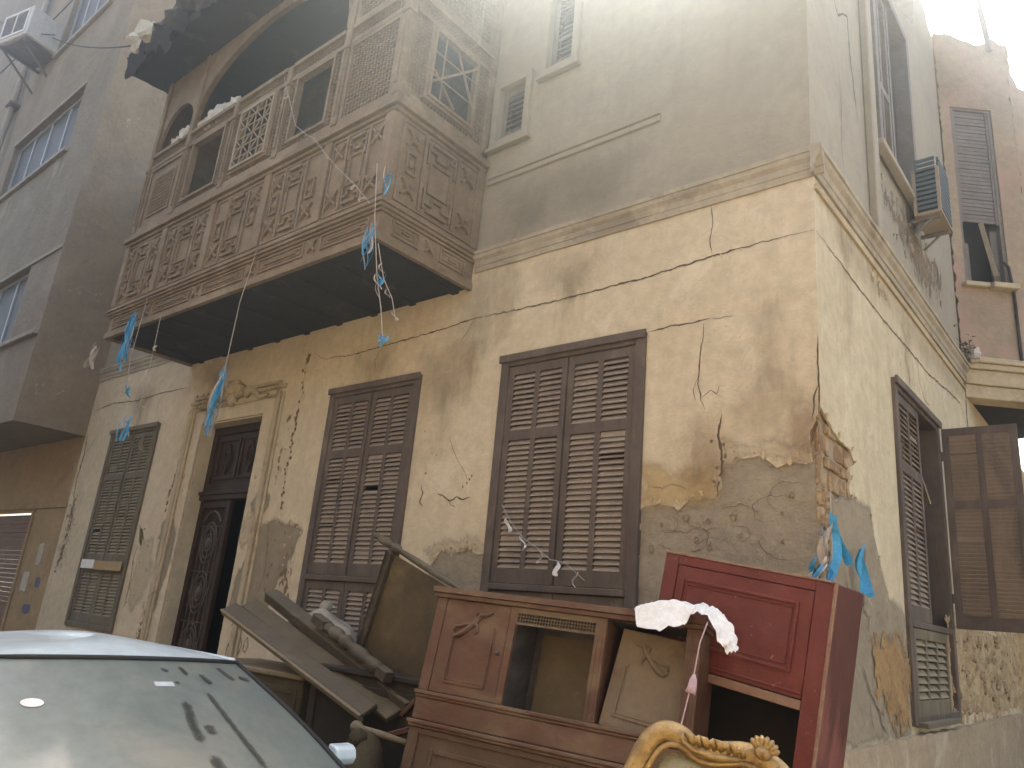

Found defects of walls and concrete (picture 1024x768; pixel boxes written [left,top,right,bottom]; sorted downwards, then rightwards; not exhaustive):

flaking render [881,173,945,307]
crack [312,208,968,424]
crack [73,387,187,497]
spalling [267,353,311,510]
crack [419,441,473,507]
peeling [426,537,483,591]
crack [649,316,730,497]
peeling [638,410,857,606]
spalling [870,630,914,737]
spalling [945,613,1024,727]